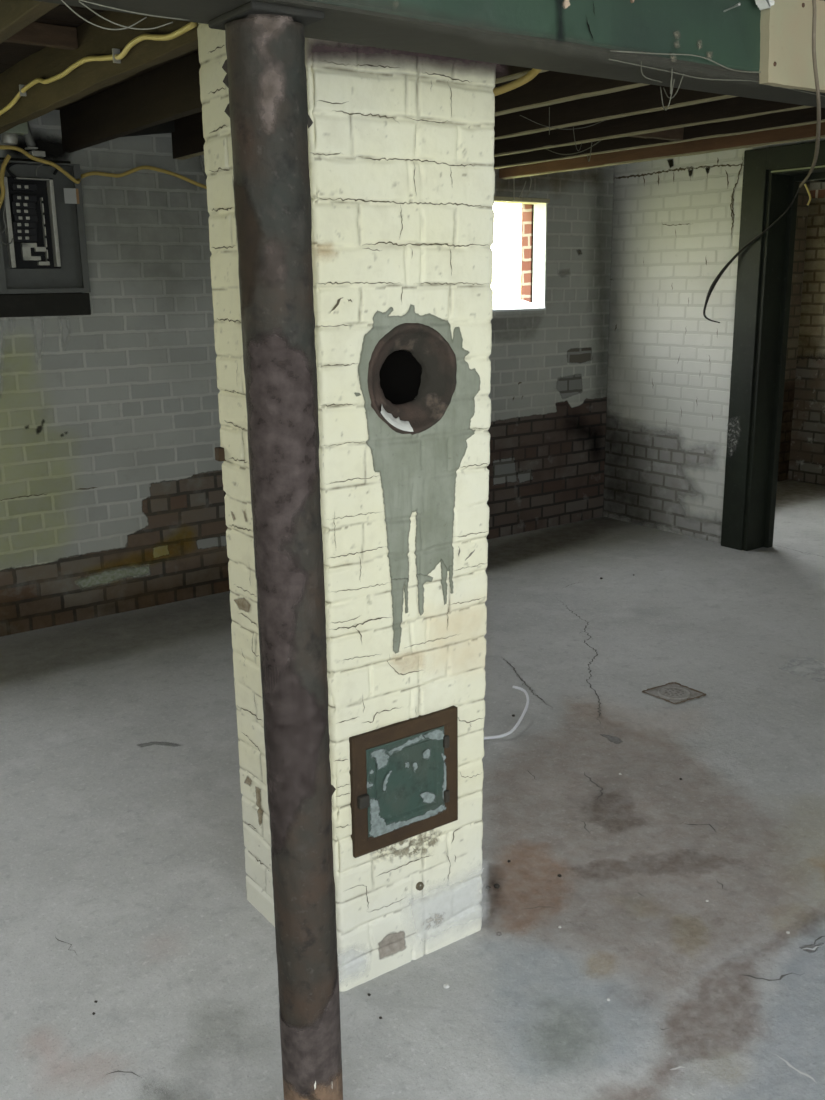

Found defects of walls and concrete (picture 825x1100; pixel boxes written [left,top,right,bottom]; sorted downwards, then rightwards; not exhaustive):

corrosion [252,14,291,133]
crack [330,61,400,69]
corrosion [233,182,287,309]
crack [313,72,489,301]
peeling [486,348,722,544]
peeling [788,355,825,486]
peeling [0,470,250,637]
corrosion [247,329,327,855]
crack [562,581,601,731]
corrosion [279,965,343,1100]